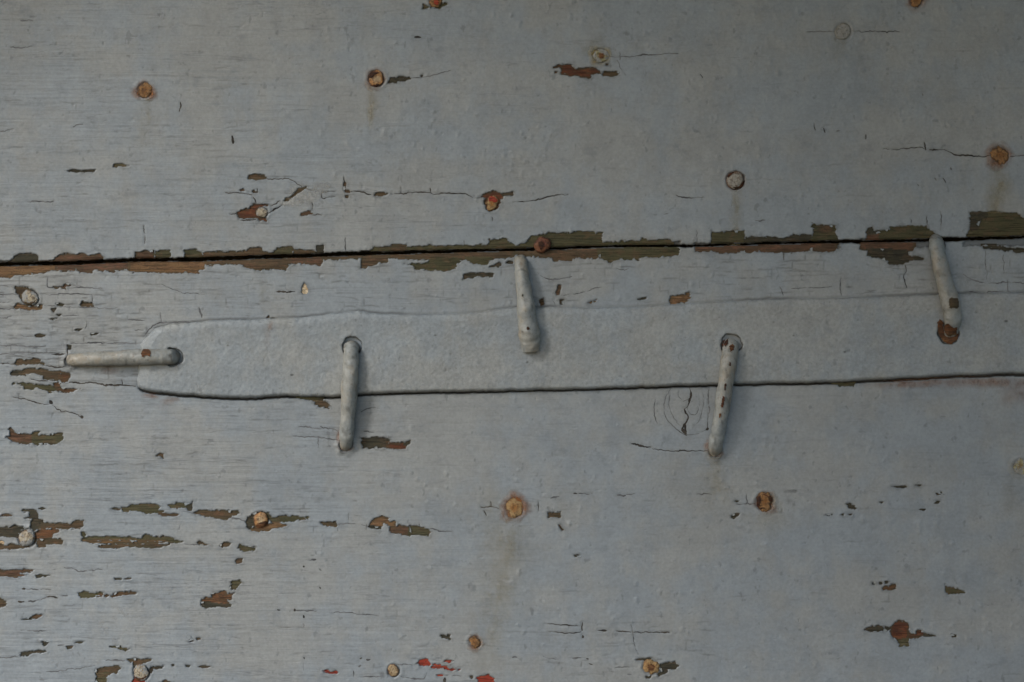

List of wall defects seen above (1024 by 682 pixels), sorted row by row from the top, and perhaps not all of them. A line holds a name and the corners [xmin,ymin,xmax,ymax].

crack [865,134,1024,186]
crack [225,177,493,221]
peeling [695,224,839,254]
peeling [859,225,944,265]
peeling [0,231,680,321]
corrosion [937,319,959,344]
peeling [10,358,77,393]
peeling [8,427,64,446]
crack [631,387,710,452]
peeling [0,507,183,550]
peeling [112,501,309,532]
peeling [864,620,935,647]